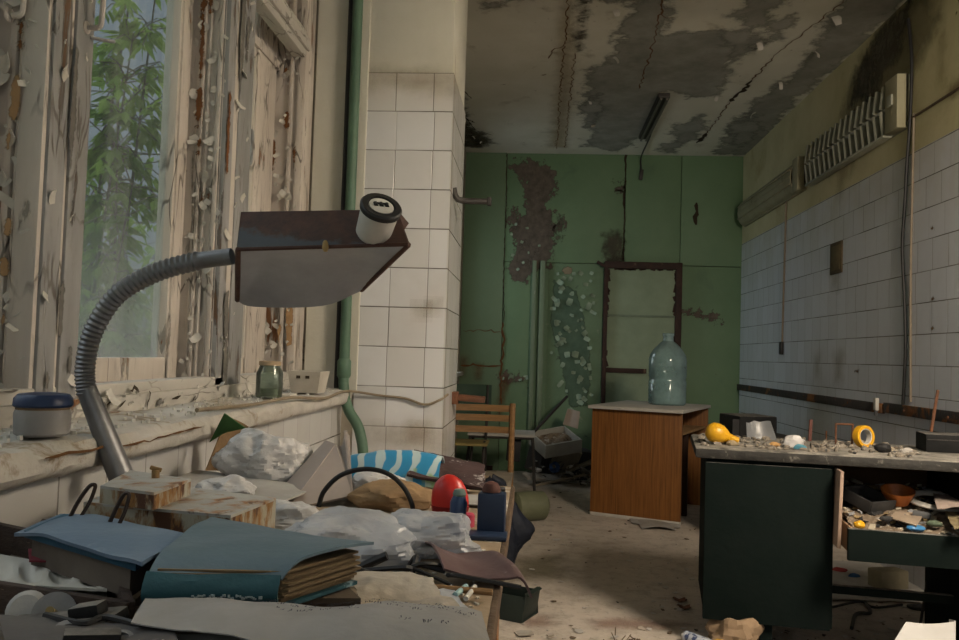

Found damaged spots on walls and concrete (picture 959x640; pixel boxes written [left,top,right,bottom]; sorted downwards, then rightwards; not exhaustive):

peeling [184,0,255,243]
peeling [272,111,297,208]
damp [464,98,494,148]
crack [696,0,844,143]
damp [712,0,940,156]
peeling [42,282,65,337]
peeling [67,346,76,387]
peeling [104,388,139,406]
peeling [178,314,202,377]
peeling [194,291,235,400]
peeling [264,308,294,364]
peeling [506,157,597,410]